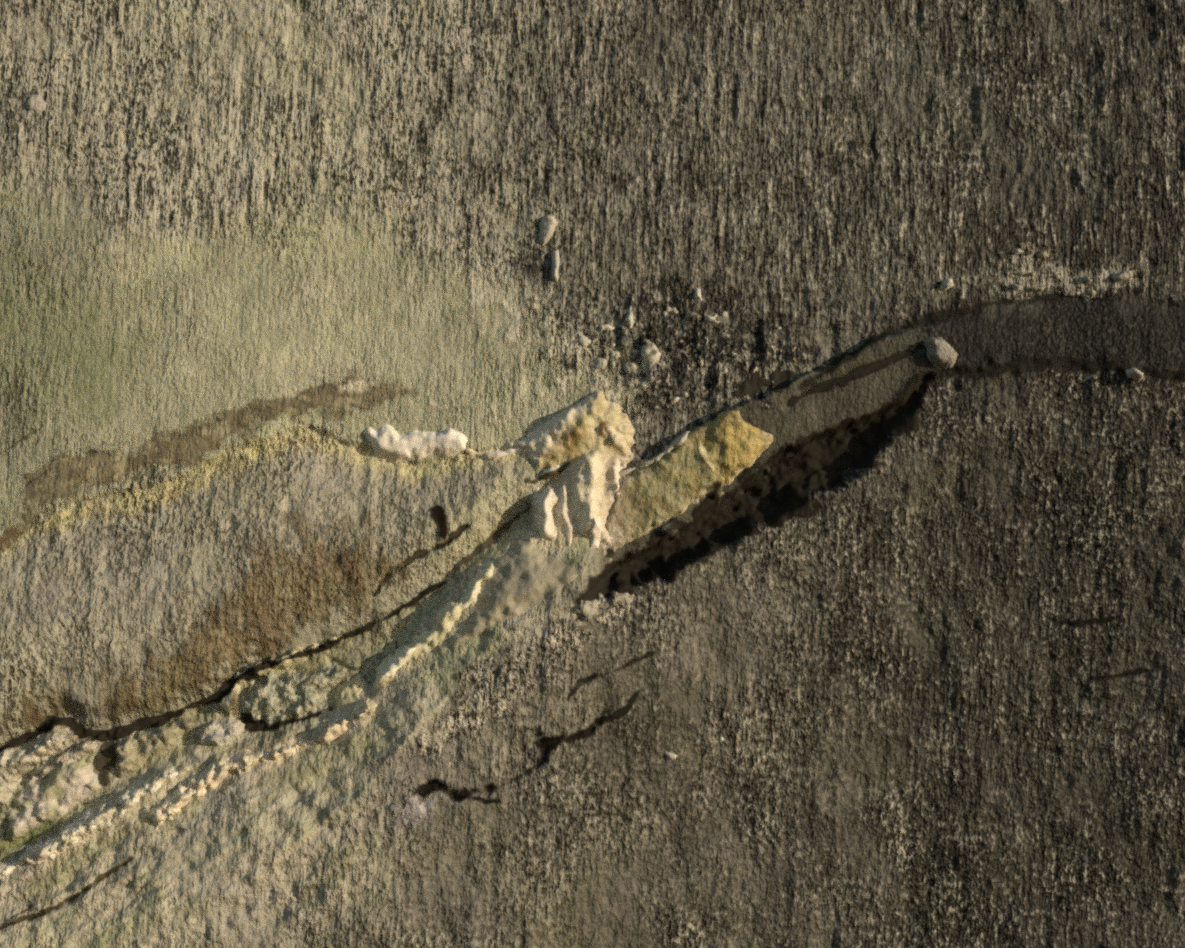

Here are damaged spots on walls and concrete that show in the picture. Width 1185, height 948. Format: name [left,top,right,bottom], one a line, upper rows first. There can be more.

crack [10,429,39,448]
damp [0,209,669,563]
spalling [606,410,773,551]
damp [658,288,728,328]
peeling [924,337,958,369]
corrosion [99,512,411,720]
spalling [418,591,634,768]
spalling [0,716,245,879]